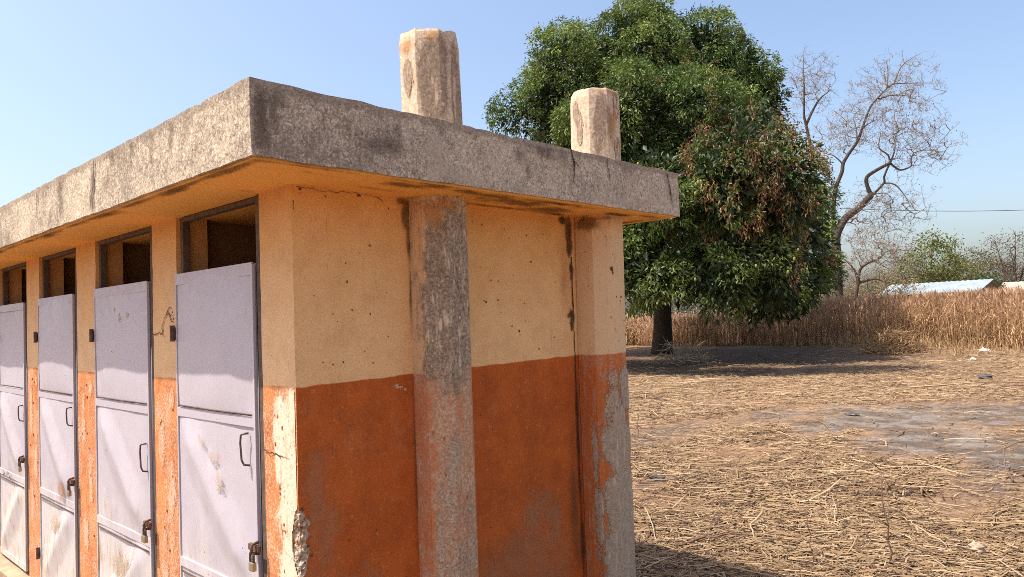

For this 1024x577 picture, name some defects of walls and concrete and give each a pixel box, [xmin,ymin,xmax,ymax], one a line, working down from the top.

crack [293,186,384,209]
damp [390,181,653,280]
peeling [271,384,326,577]
peeling [592,363,636,577]